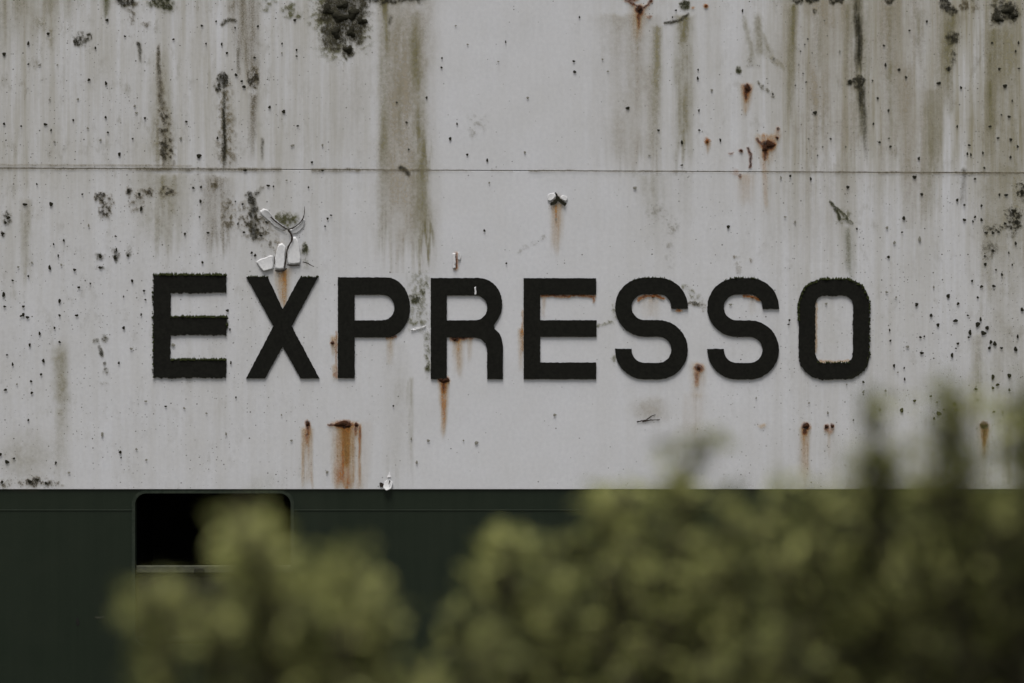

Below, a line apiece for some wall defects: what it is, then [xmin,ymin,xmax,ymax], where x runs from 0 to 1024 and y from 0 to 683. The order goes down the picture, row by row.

damp [105,0,288,211]
damp [380,0,433,261]
rust [625,0,653,27]
rust [730,127,780,177]
damp [789,4,826,119]
damp [812,0,879,130]
rust [327,420,361,489]
rust [438,377,450,423]